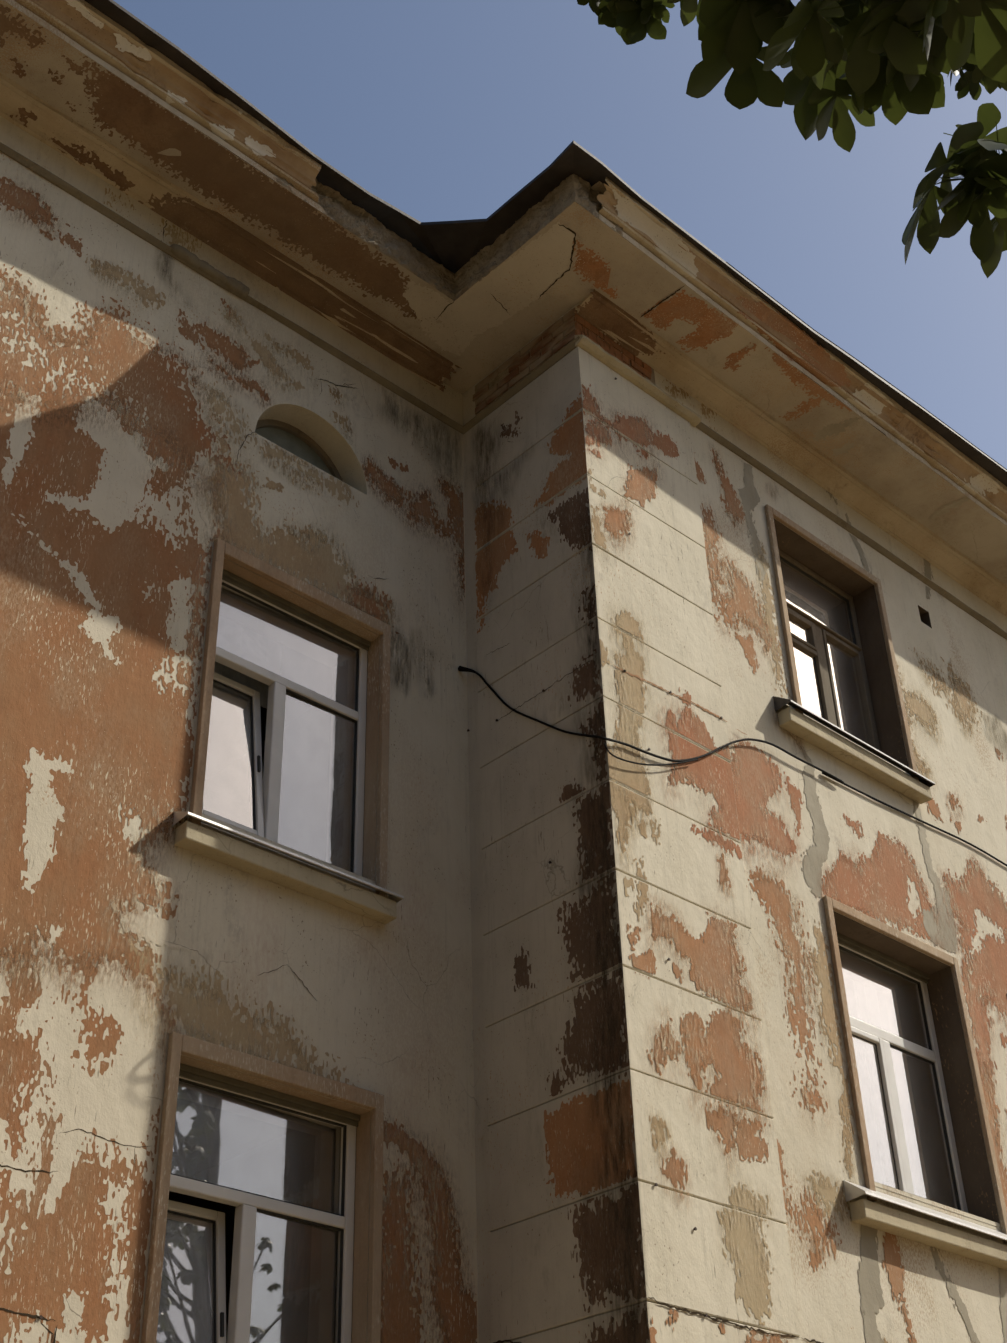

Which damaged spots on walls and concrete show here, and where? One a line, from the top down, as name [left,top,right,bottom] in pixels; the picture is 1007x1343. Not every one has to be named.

peeling [113,33,152,61]
peeling [48,55,462,392]
crack [540,225,576,297]
peeling [361,384,792,699]
peeling [957,470,1003,499]
peeling [0,176,404,1343]
peeling [896,647,982,780]
peeling [926,791,963,833]
peeling [512,946,535,992]
peeling [543,584,855,1343]
peeling [822,813,1007,1211]
peeling [381,1119,477,1343]